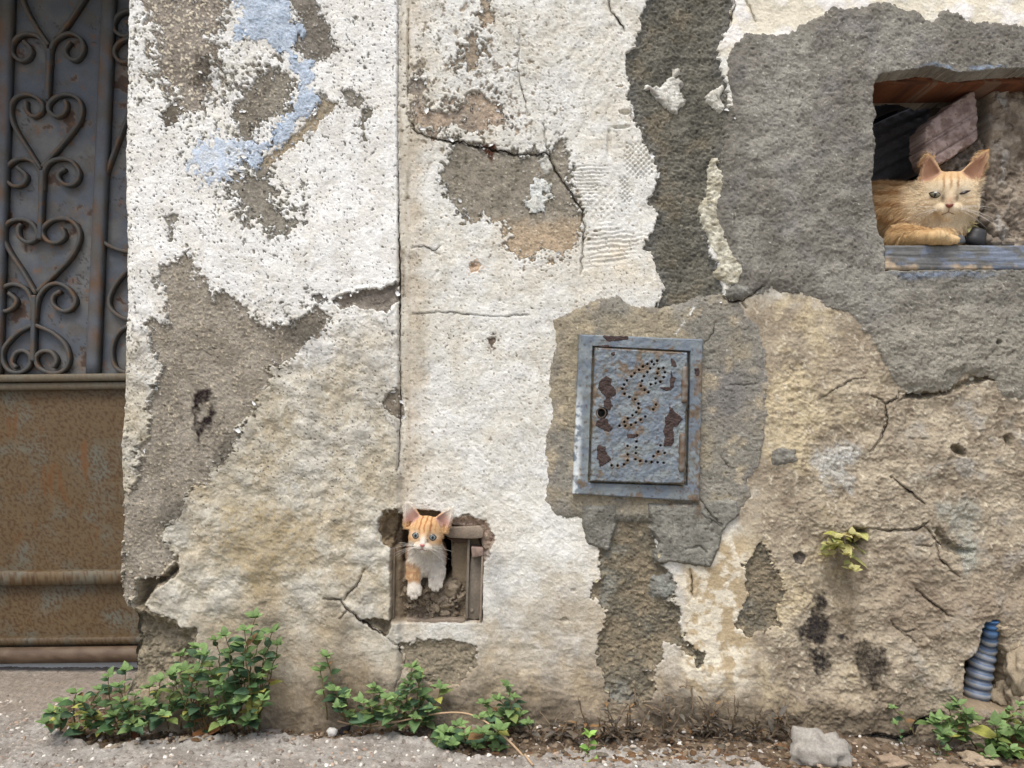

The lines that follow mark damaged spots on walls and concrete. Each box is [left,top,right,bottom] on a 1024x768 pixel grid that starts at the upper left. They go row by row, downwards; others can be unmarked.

peeling [134,0,373,240]
peeling [404,70,590,265]
crack [413,41,586,264]
peeling [122,214,406,691]
crack [823,378,933,451]
crack [326,571,404,692]
water stain [797,564,854,674]
water stain [856,639,889,688]